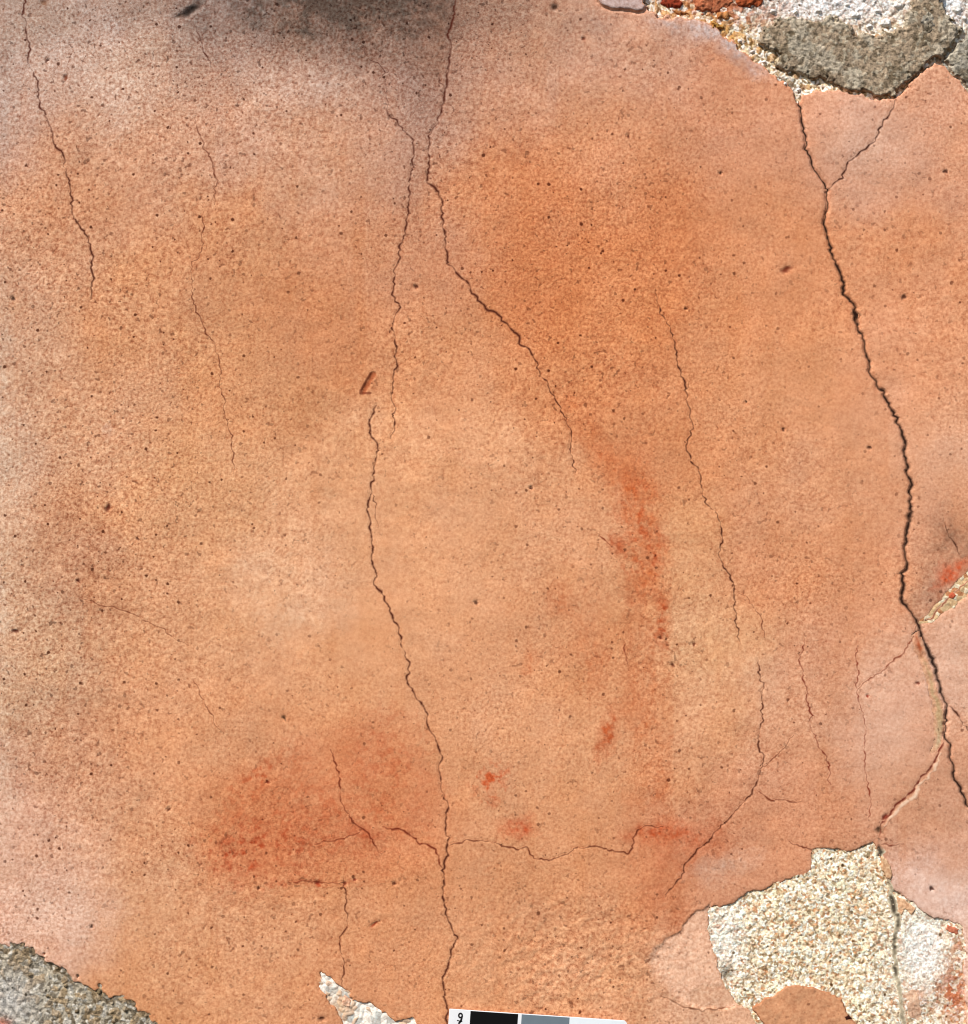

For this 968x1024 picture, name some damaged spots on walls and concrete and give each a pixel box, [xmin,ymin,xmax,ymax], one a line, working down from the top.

crack [21,0,96,300]
flaking render [599,0,968,103]
crack [314,0,663,1024]
crack [654,288,831,900]
crack [797,98,968,1024]
flaking render [0,943,158,1024]
flaking render [319,972,416,1024]
crack [660,995,740,1012]
flaking render [645,812,967,1024]